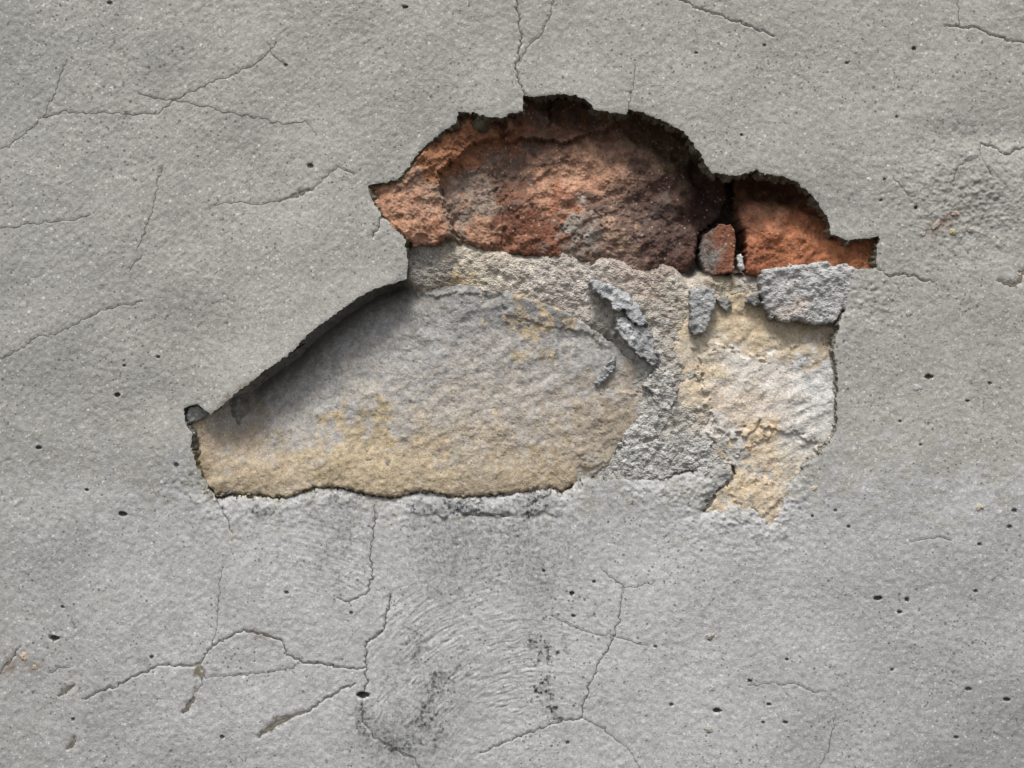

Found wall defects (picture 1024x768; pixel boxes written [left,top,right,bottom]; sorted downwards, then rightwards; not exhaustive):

crack [514,0,555,92]
crack [681,0,774,37]
crack [945,0,1024,43]
crack [0,41,316,149]
crack [218,166,351,205]
crack [0,301,142,359]
spalling [183,94,880,526]
crack [85,504,419,768]
crack [480,571,652,768]